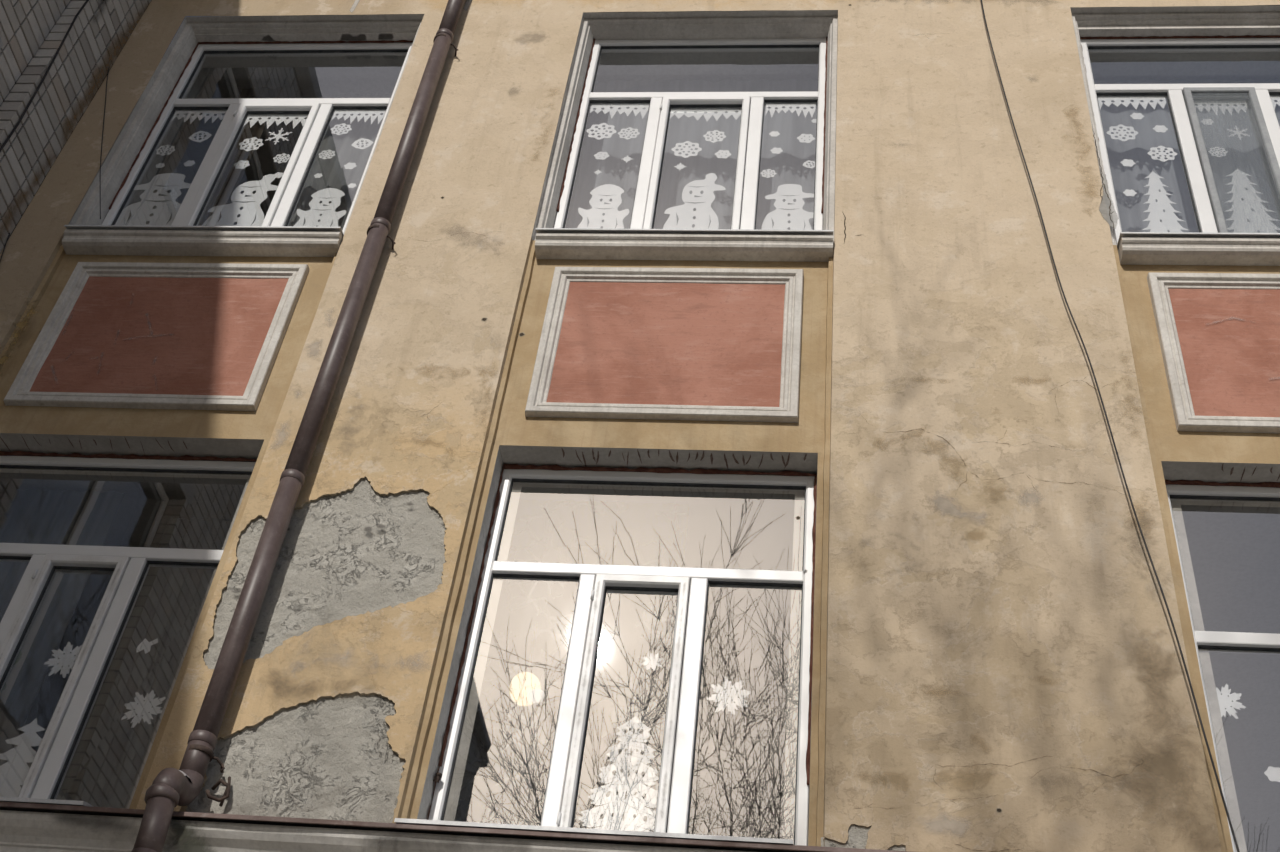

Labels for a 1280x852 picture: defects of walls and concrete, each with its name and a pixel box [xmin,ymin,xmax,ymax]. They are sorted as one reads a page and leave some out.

spalling [203,515,267,669]
spalling [243,476,447,663]
spalling [186,691,406,823]